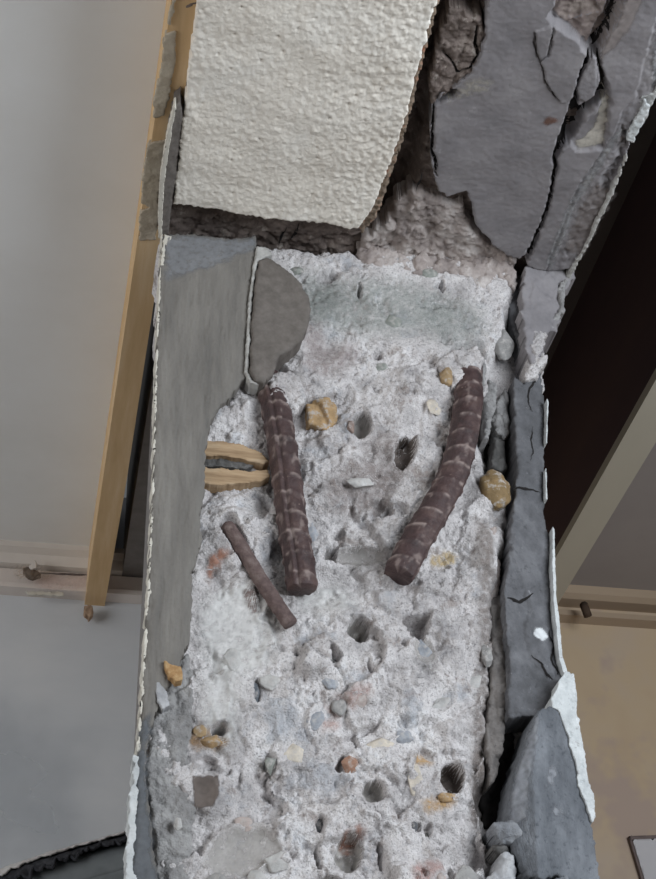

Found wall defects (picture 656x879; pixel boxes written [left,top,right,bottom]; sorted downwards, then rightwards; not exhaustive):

crack [527,0,616,254]
spalling [123,0,527,879]
peeling [541,370,549,448]
peeling [544,527,596,824]